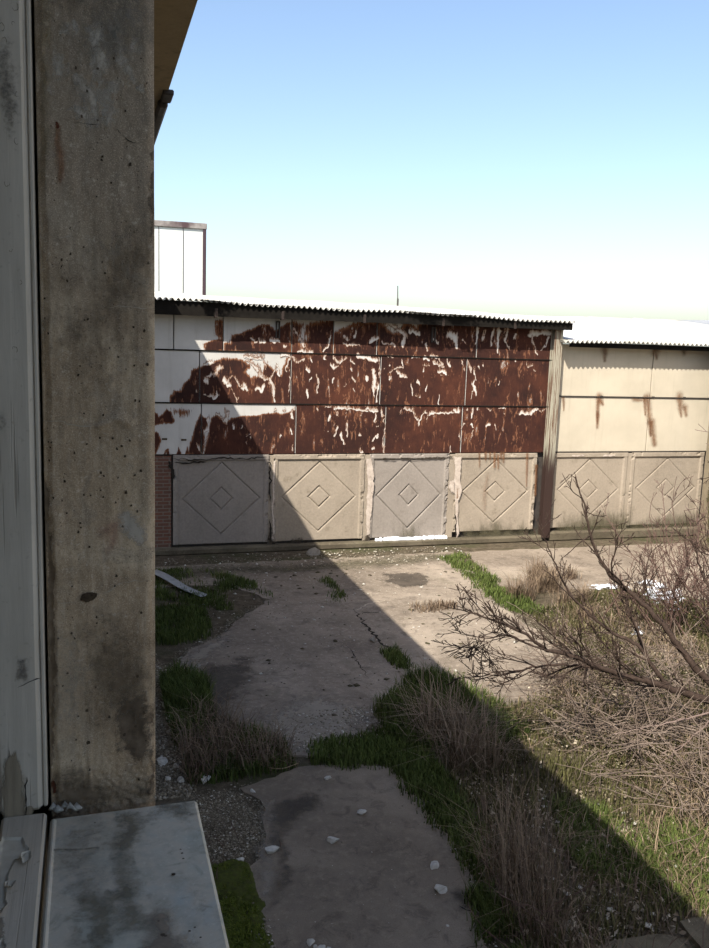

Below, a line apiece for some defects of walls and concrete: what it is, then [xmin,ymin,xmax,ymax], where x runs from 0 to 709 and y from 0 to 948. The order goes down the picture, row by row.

rust [155,319,552,495]
rust [634,398,655,446]
crack [356,600,389,647]
peeling [1,752,33,818]
water stain [54,774,126,813]
peeling [0,836,32,948]
water stain [79,814,183,948]